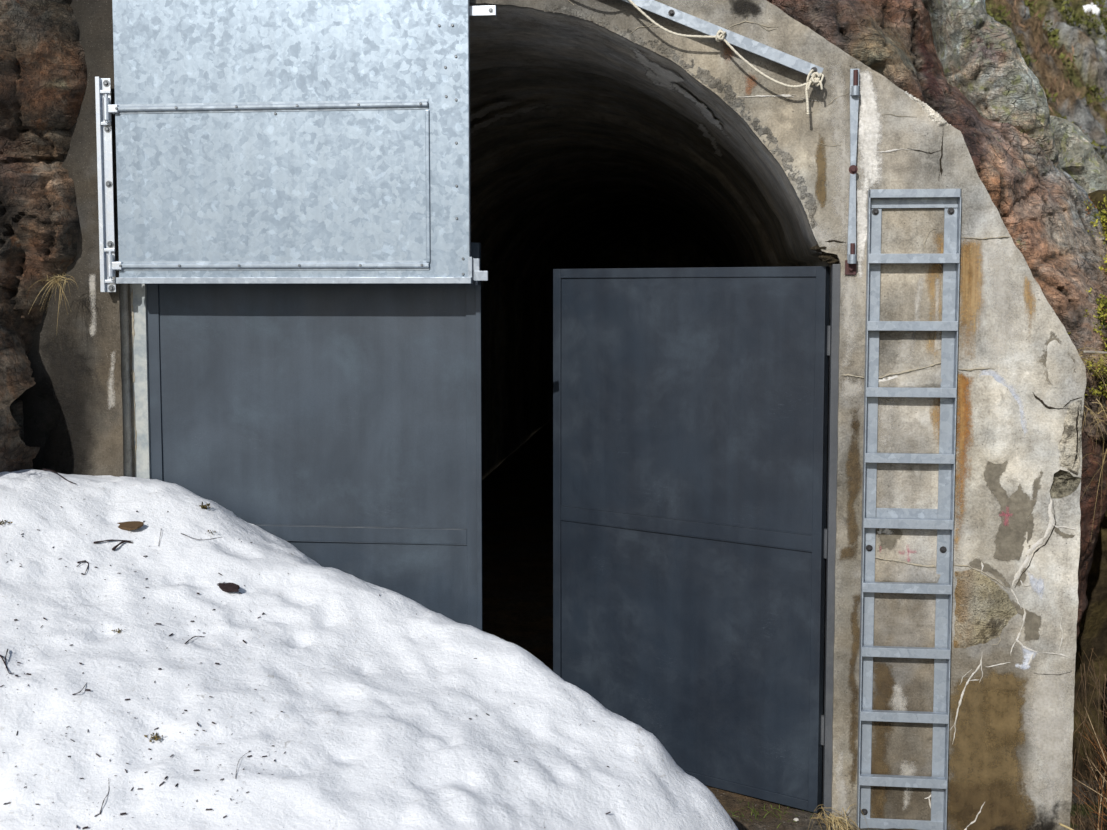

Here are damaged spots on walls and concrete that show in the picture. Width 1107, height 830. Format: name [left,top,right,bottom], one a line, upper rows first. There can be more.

rust [959,242,982,336]
crack [1034,394,1082,469]
damp [947,461,1070,830]
crack [949,499,1076,745]